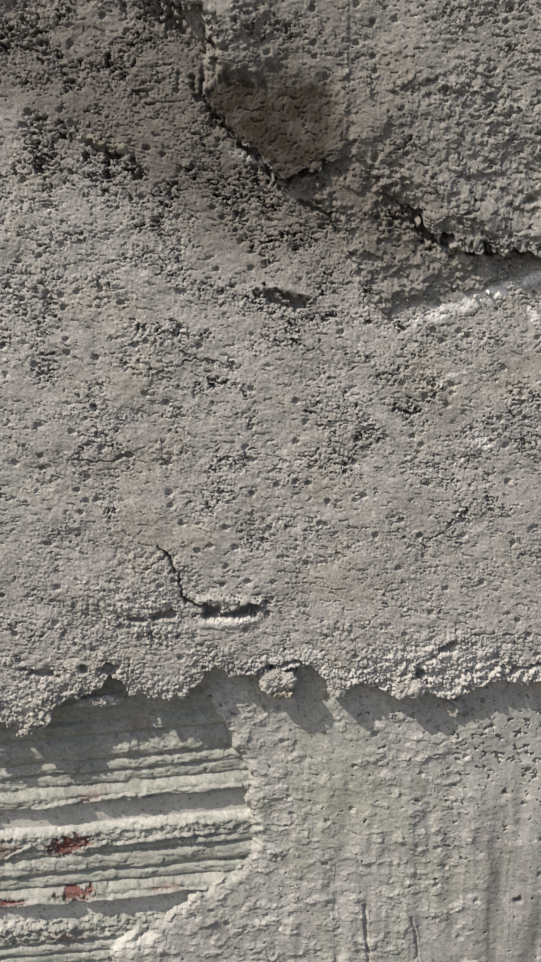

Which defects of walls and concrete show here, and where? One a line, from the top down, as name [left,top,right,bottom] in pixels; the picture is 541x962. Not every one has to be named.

crack [146,545,203,610]
flaking render [65,780,111,808]
flaking render [0,827,108,862]
flaking render [0,889,29,910]
flaking render [51,882,106,903]
flaking render [47,923,95,949]